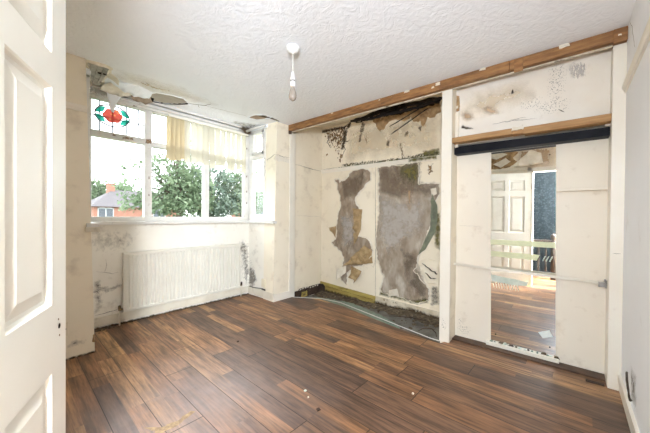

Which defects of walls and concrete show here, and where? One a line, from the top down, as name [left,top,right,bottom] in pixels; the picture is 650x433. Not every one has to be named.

peeling [151,92,190,106]
flaking render [373,103,441,131]
flaking render [322,122,351,162]
flaking render [331,162,441,305]
mould [240,244,256,284]
water stain [94,293,249,330]